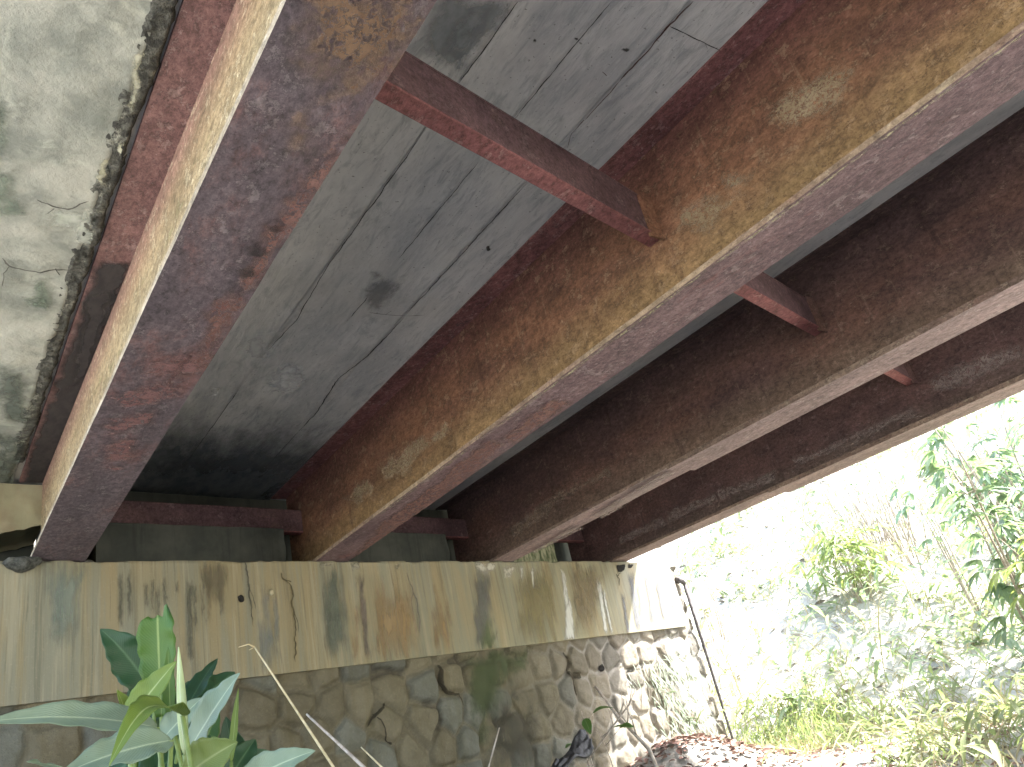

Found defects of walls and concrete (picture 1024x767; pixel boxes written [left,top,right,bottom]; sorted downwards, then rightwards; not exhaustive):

corrosion [313,0,420,94]
crack [38,200,88,214]
spalling [14,0,179,463]
crack [2,258,83,286]
damp [130,432,318,500]
crack [281,573,299,659]
damp [324,573,345,647]
damp [360,582,368,653]
damp [476,575,494,648]
damp [519,568,612,641]